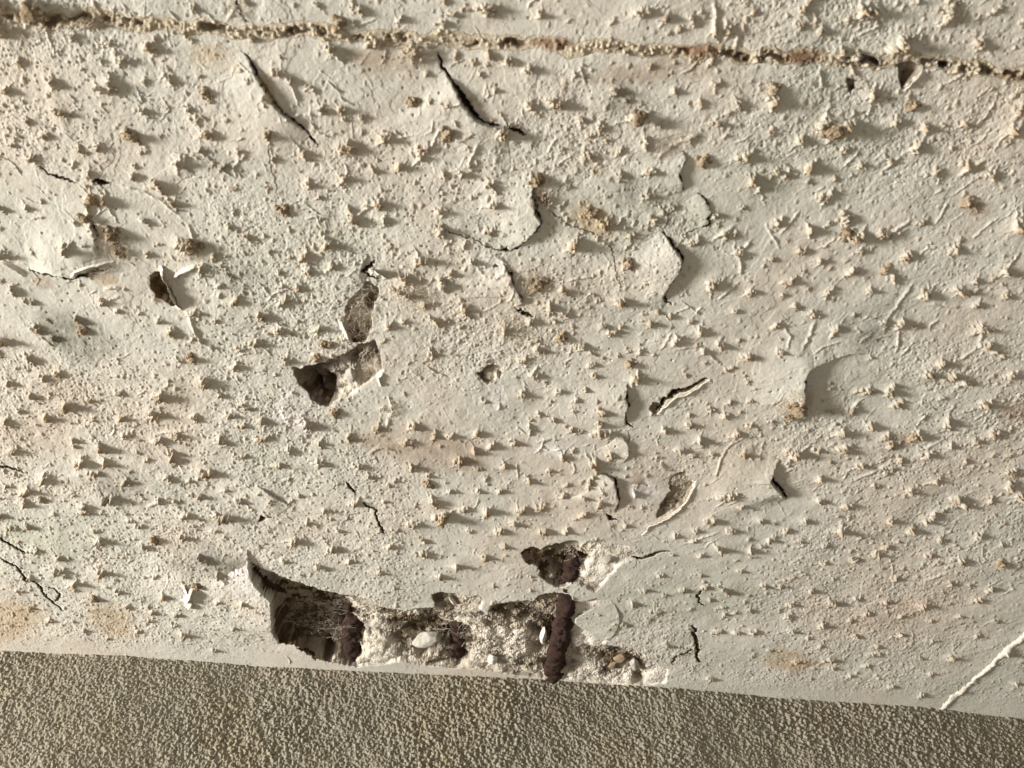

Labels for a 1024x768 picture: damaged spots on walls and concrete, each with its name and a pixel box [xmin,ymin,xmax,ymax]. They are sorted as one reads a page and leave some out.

crack [246,54,318,147]
crack [437,52,526,135]
spalling [150,265,195,311]
spalling [292,269,387,407]
peeling [649,379,713,416]
spalling [642,460,699,536]
crack [0,537,65,612]
spalling [250,539,669,685]